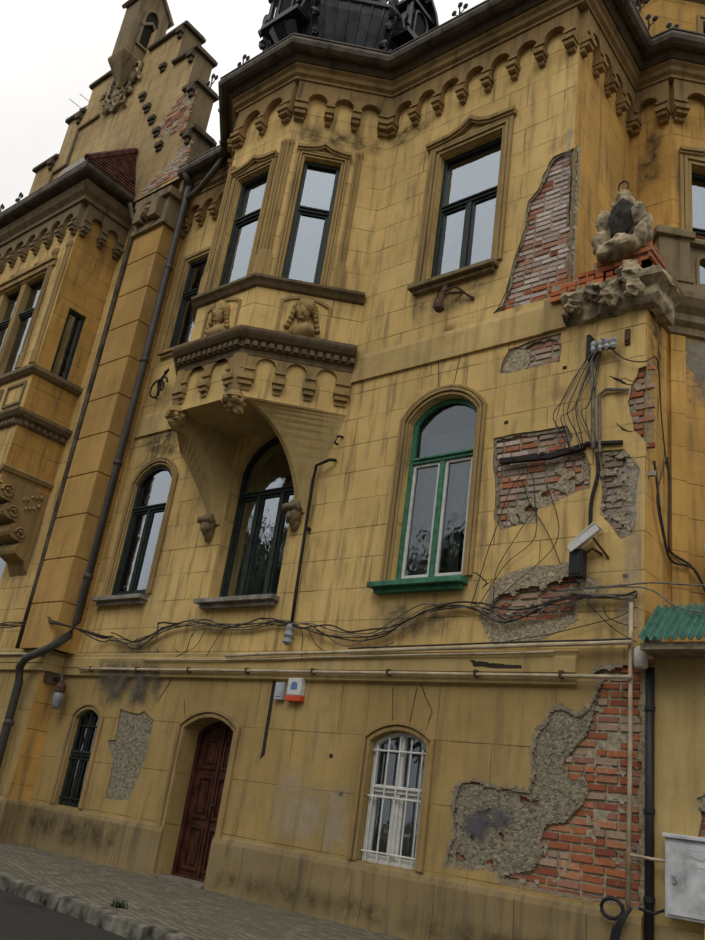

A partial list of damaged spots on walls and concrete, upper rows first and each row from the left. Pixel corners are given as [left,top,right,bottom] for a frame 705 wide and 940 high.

flaking render [157,85,199,138]
flaking render [142,141,193,195]
flaking render [495,144,581,313]
flaking render [501,334,567,373]
spalling [629,361,656,450]
flaking render [494,421,656,539]
flaking render [479,562,603,644]
peeling [106,709,153,801]
flaking render [443,658,655,911]